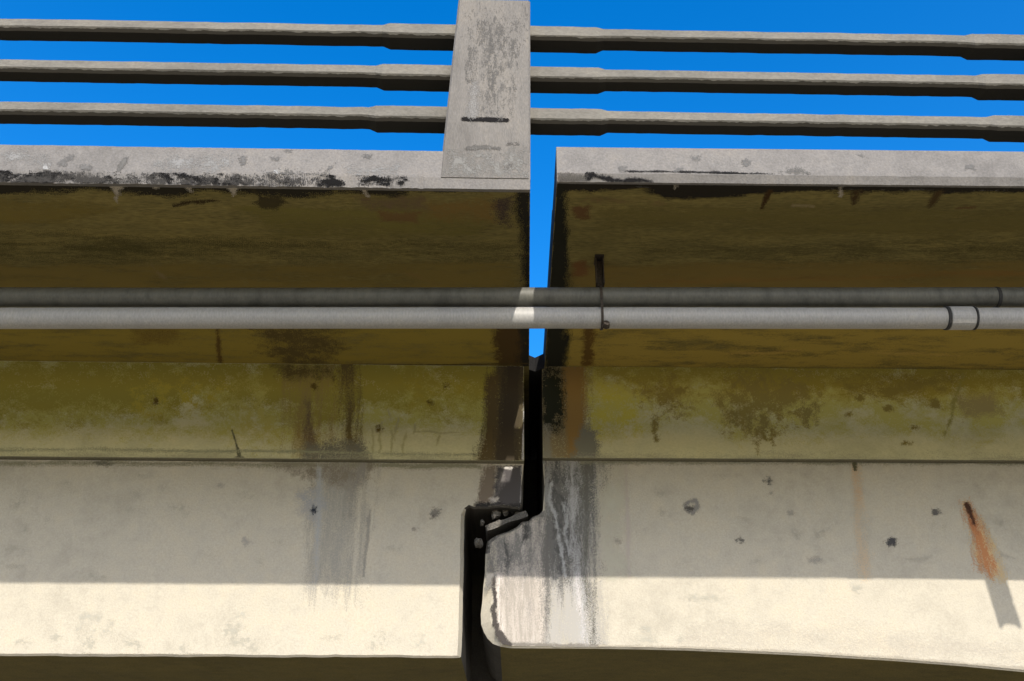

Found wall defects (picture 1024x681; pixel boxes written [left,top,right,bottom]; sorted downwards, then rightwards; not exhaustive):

water stain [0,329,529,612]
water stain [485,329,1024,670]
corrosion [958,499,1008,584]